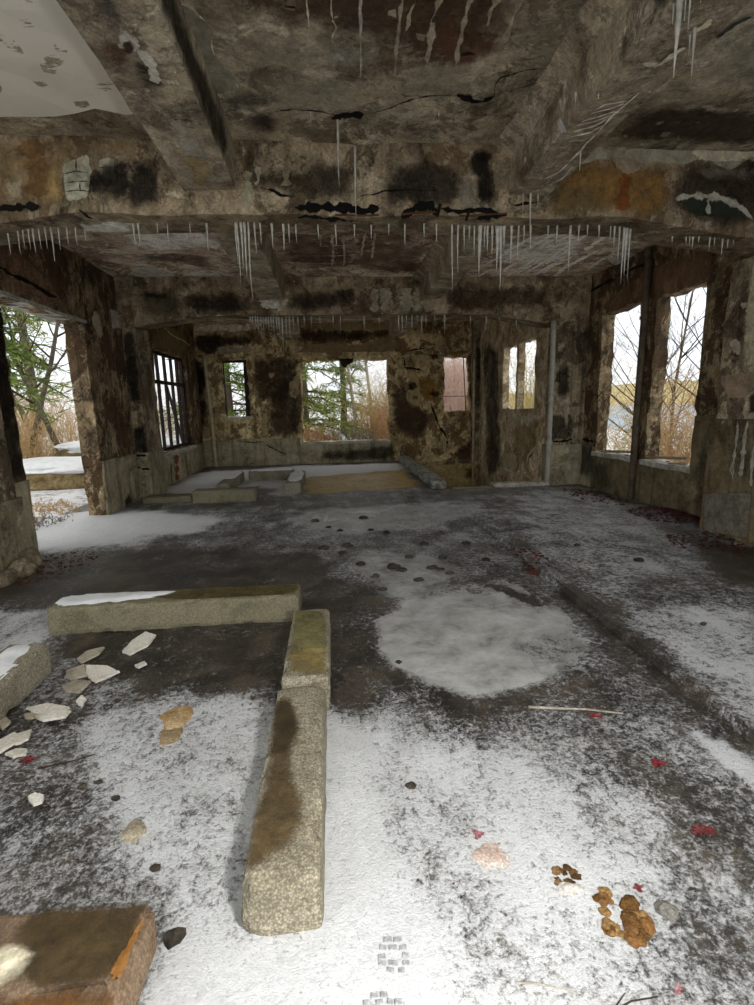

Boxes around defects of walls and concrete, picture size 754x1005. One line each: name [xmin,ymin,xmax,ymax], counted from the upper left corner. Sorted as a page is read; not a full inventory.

water stain [394,0,416,73]
water stain [425,0,443,63]
water stain [454,0,474,67]
water stain [486,0,501,26]
peeling [34,44,67,87]
crack [275,69,537,120]
crack [0,201,39,212]
rust [554,161,666,214]
water stain [81,222,237,277]
water stain [306,233,421,271]
water stain [730,395,754,486]